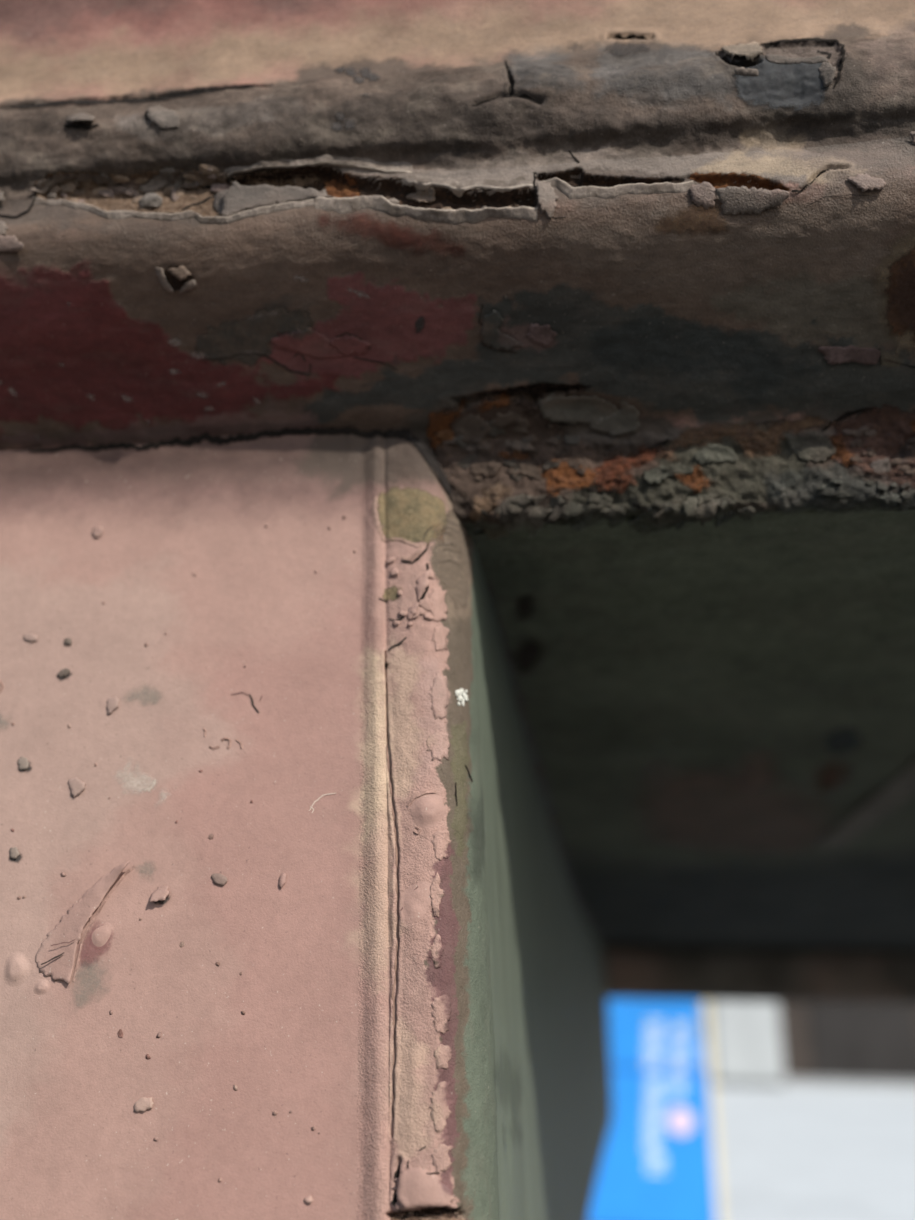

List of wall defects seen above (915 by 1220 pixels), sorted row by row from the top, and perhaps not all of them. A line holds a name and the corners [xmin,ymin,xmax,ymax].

peeling [716,38,848,110]
peeling [537,181,558,218]
peeling [689,182,790,216]
peeling [806,173,886,207]
peeling [155,265,197,293]
corrosion [878,236,915,347]
corrosion [427,382,670,527]
peeling [426,674,451,761]
peeling [430,830,451,917]
peeling [35,861,135,984]
peeling [431,934,444,969]
spalling [388,994,466,1220]